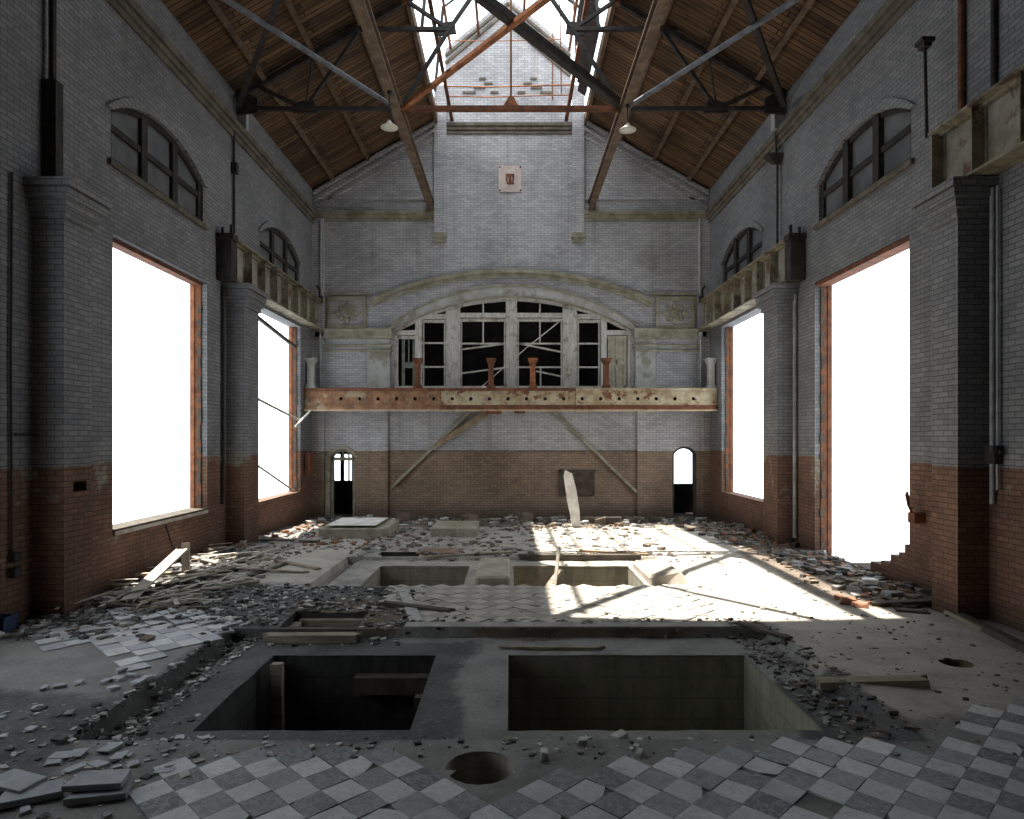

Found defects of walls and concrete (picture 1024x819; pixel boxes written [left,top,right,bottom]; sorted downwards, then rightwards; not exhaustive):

spalling [39,679,85,691]
spalling [99,666,154,692]